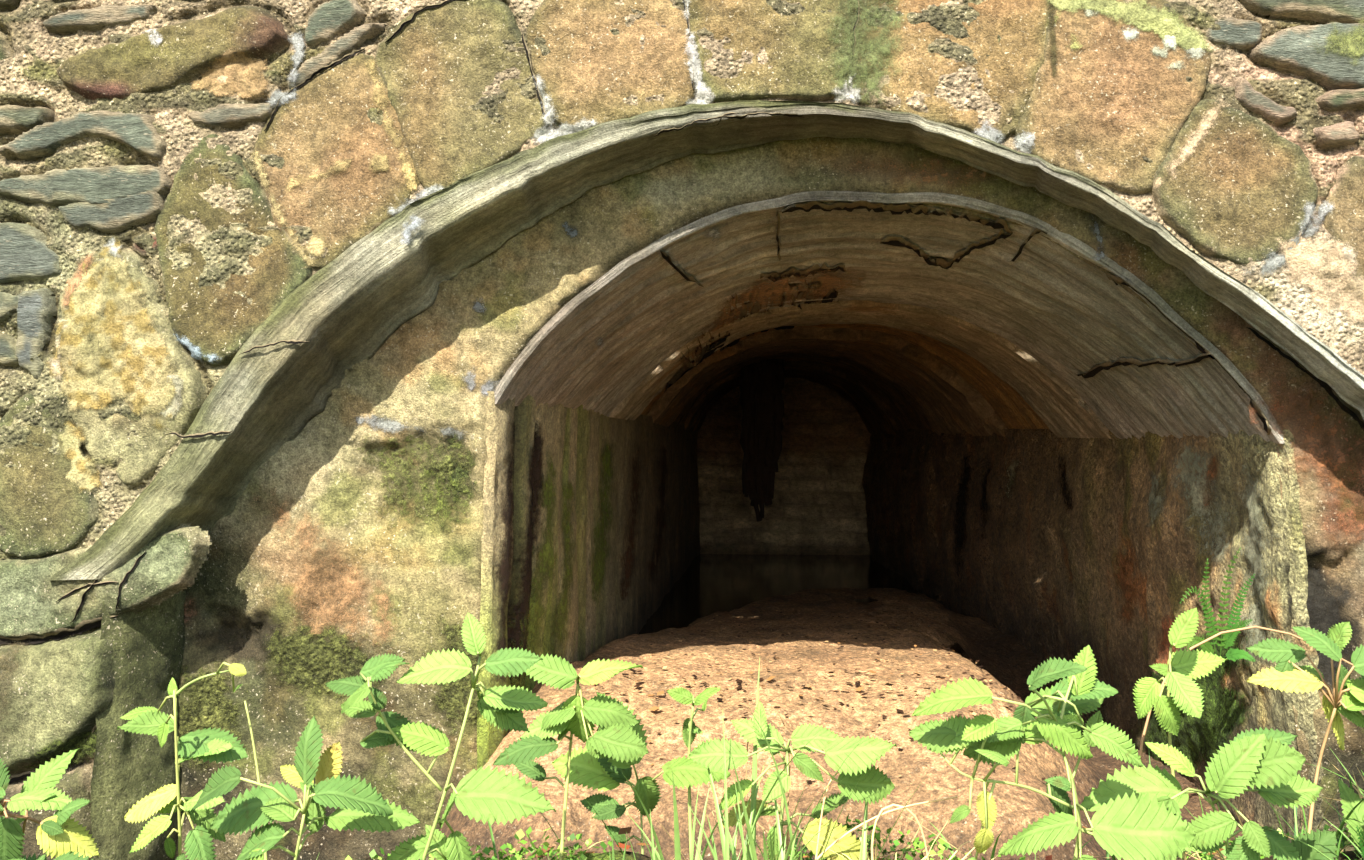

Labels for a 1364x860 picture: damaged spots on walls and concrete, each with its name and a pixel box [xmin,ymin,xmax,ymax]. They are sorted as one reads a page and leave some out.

crack [253,0,453,266]
crack [239,340,310,355]
crack [660,200,1047,392]
crack [1077,273,1272,435]
crack [1246,327,1364,431]
crack [0,551,146,645]